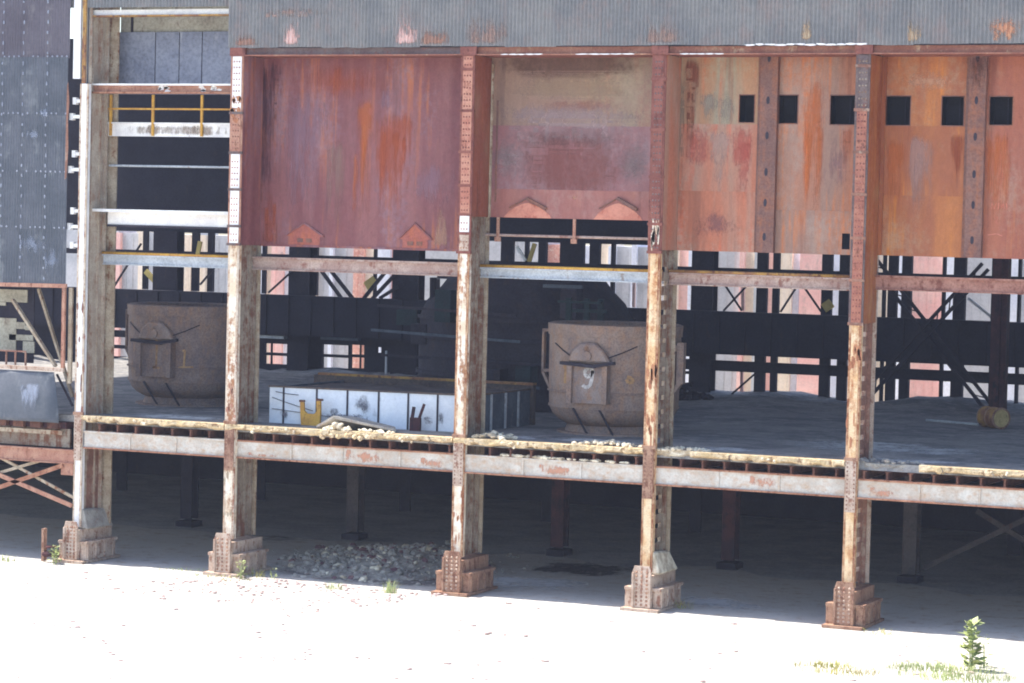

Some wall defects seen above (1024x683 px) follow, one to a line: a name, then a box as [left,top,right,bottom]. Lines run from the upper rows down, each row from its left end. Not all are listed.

corrosion [685,62,698,135]